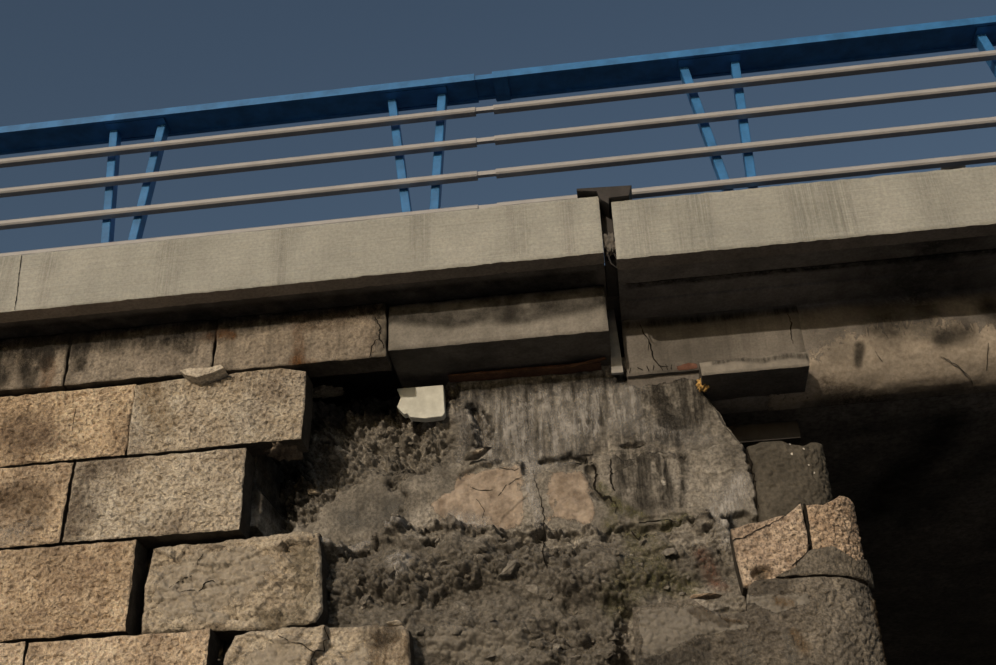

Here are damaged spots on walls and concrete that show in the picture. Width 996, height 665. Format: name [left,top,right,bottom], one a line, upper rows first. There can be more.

damp [0,273,606,389]
crack [369,317,384,358]
crack [624,325,672,373]
damp [855,342,863,364]
damp [934,325,971,345]
damp [980,300,996,319]
damp [453,374,710,527]
spalling [326,402,733,665]
damp [709,475,746,548]
crack [733,449,811,566]
spalling [242,635,307,665]
crack [278,626,330,665]